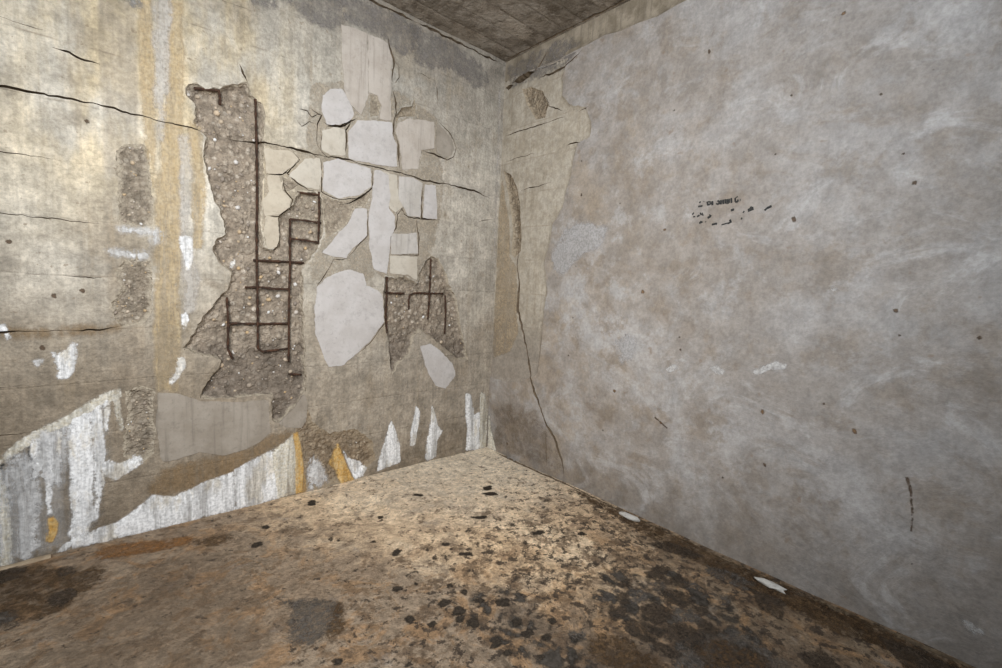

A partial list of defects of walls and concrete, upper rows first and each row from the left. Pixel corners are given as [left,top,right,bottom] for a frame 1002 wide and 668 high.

crack [0,16,98,64]
crack [0,326,118,334]
rust [139,0,206,345]
damp [0,390,442,626]
crack [0,39,491,286]
flaking render [156,24,468,491]
damp [278,598,346,645]
damp [465,392,496,451]
crack [369,0,625,161]
crack [498,259,974,668]